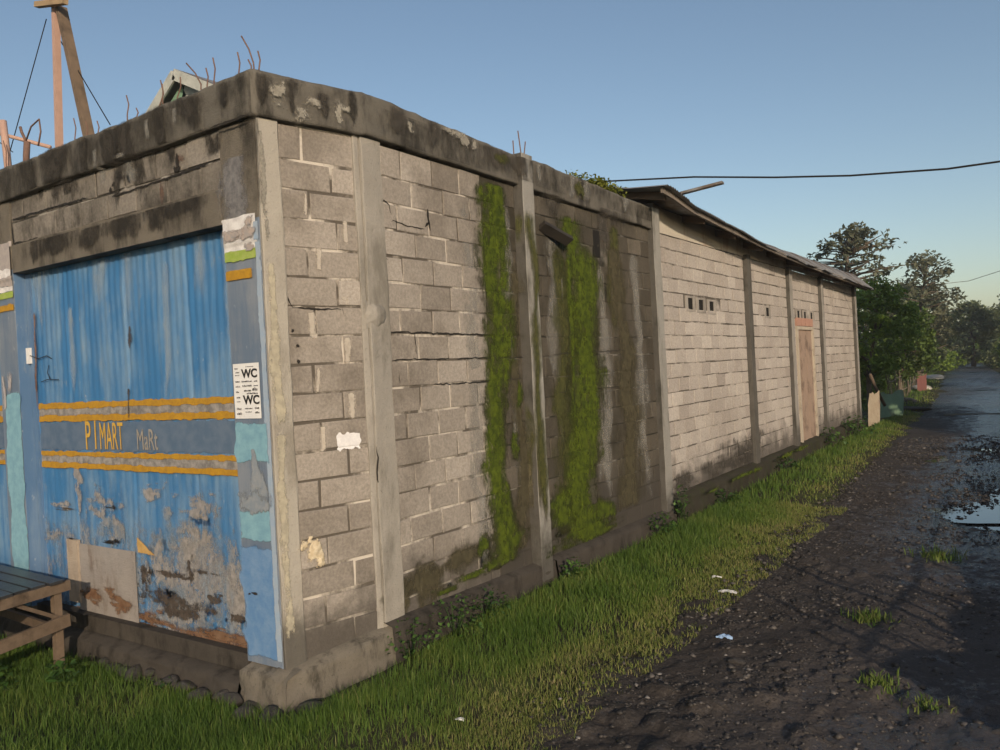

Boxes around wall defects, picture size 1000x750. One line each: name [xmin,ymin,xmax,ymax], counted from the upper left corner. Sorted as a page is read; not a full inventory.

damp [256,73,267,104]
damp [348,91,356,120]
damp [0,145,77,200]
damp [30,232,68,263]
damp [79,94,199,249]
damp [219,125,258,220]
peeling [222,131,270,251]
peeling [268,263,286,423]
damp [597,208,643,511]
peeling [51,458,125,547]
peeling [137,482,245,639]
peeling [238,435,295,638]